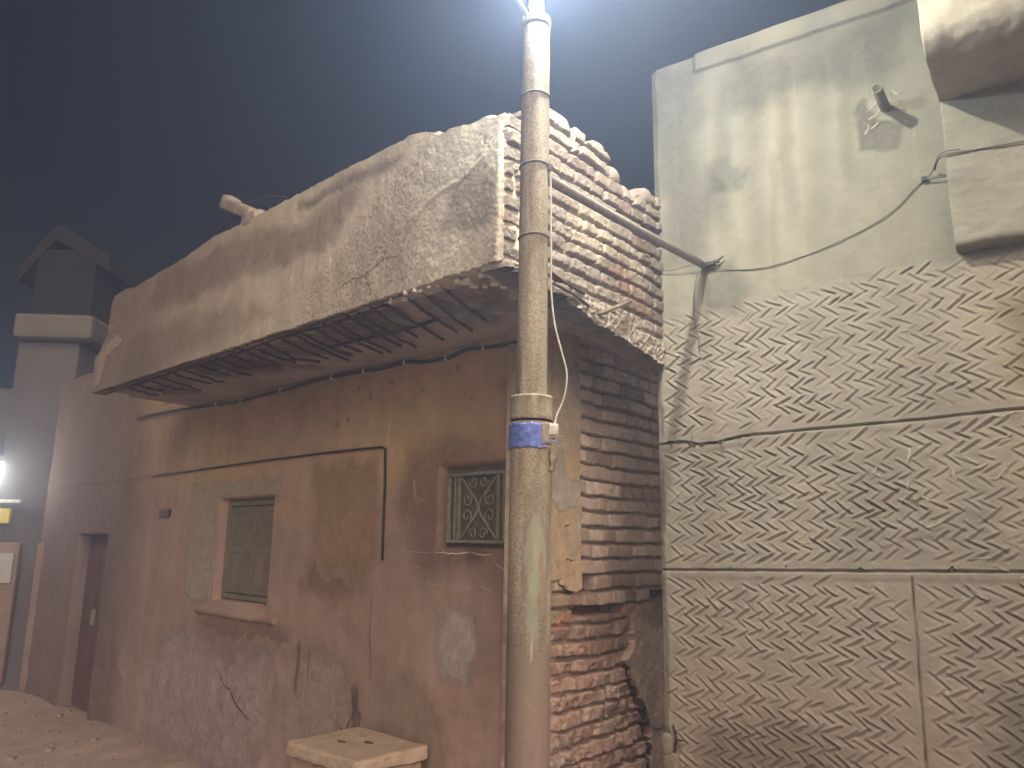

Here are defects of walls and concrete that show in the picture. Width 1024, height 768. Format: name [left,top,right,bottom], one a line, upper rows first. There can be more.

crack [334,246,399,295]
spalling [552,271,590,307]
spalling [571,604,611,614]
crack [219,673,250,720]
flaking render [145,626,360,768]
crack [620,664,689,768]